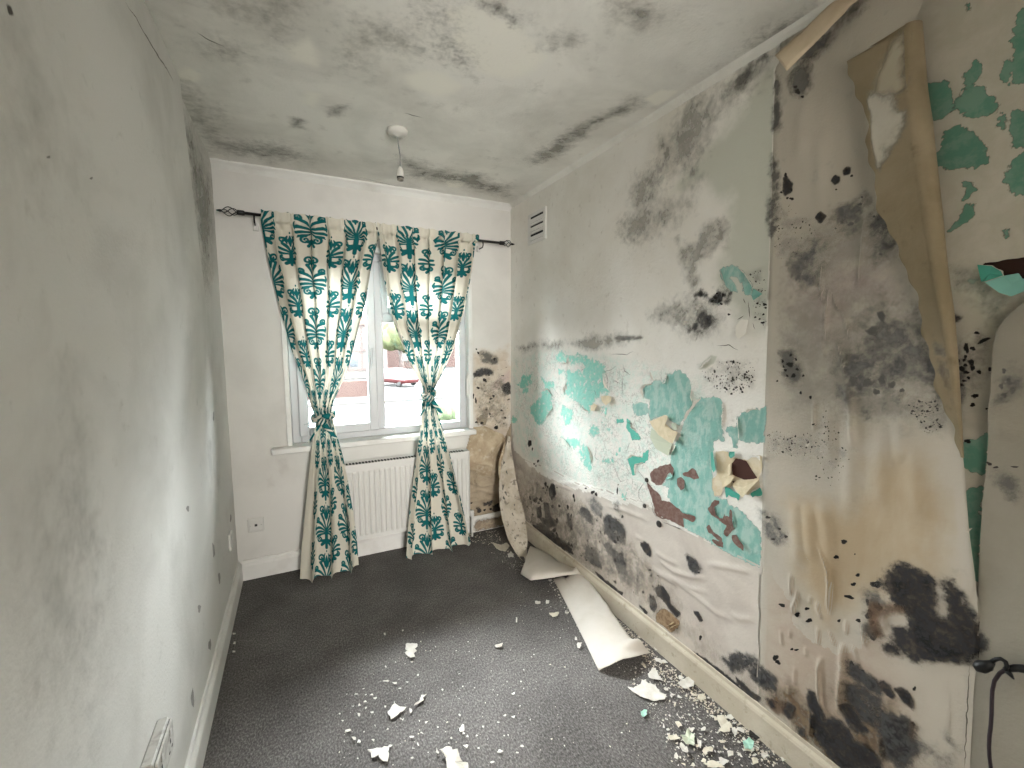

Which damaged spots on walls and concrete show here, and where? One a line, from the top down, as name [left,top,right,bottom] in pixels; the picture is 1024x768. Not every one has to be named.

water stain [194,166,210,252]
water stain [410,165,499,191]
water stain [541,106,627,158]
water stain [624,3,942,402]
flaking render [916,0,1024,600]
water stain [466,339,511,438]
peeling [511,340,767,568]
peeling [493,542,514,557]
water stain [470,461,681,632]
water stain [686,555,701,574]
water stain [696,400,988,768]